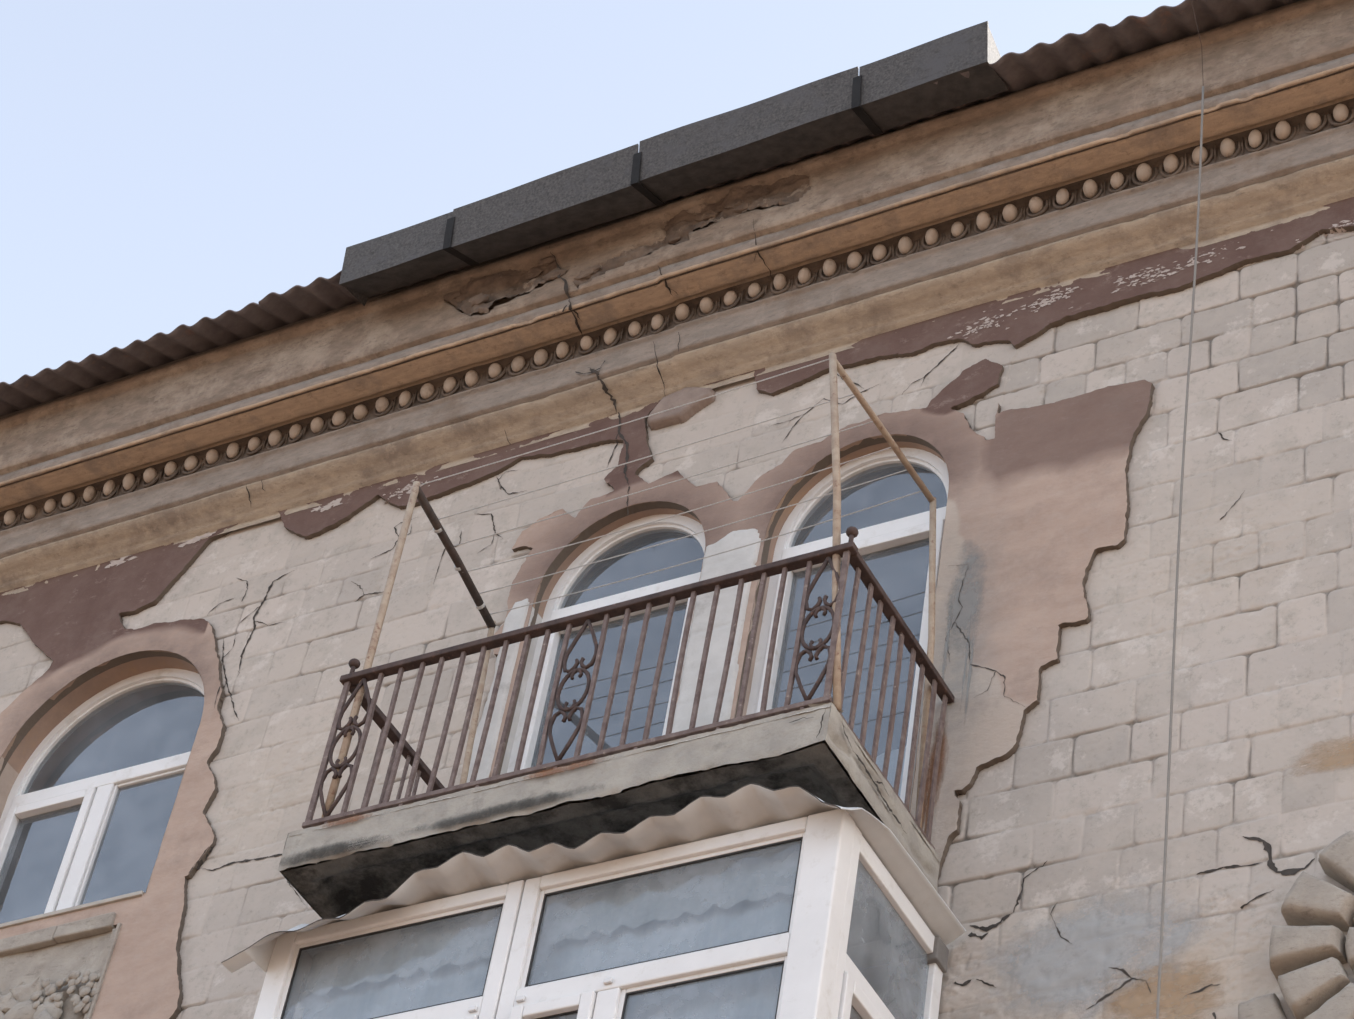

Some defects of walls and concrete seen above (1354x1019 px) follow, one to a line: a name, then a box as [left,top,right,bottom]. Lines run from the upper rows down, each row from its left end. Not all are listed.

crack [549,247,583,336]
crack [653,332,680,394]
crack [575,360,630,513]
peeling [0,623,53,713]
crack [208,571,292,719]
crack [945,564,1025,707]
peeling [638,220,1354,1019]
leakage [289,839,376,864]
leakage [418,793,571,829]
crack [1197,836,1315,909]